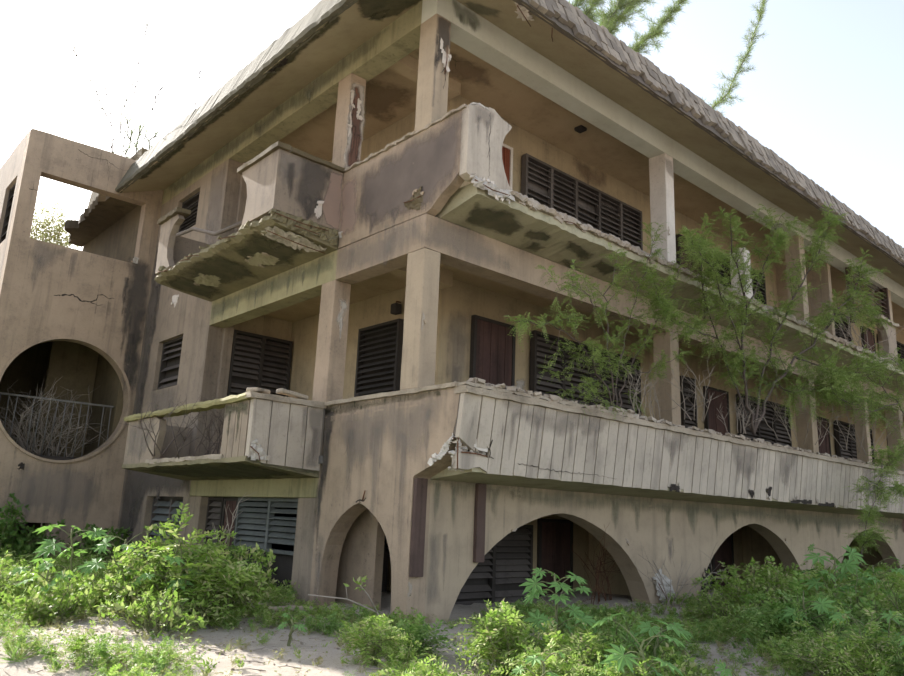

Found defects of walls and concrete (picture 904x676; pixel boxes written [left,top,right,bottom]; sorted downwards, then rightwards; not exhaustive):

spalling [440,38,452,74]
spalling [261,84,364,254]
peeling [359,118,460,231]
leakage [466,204,550,252]
peeling [245,252,280,268]
leakage [562,241,615,275]
spalling [470,173,883,361]
crack [54,294,114,306]
leakage [122,235,329,414]
spalling [250,439,271,461]
spalling [427,433,488,472]